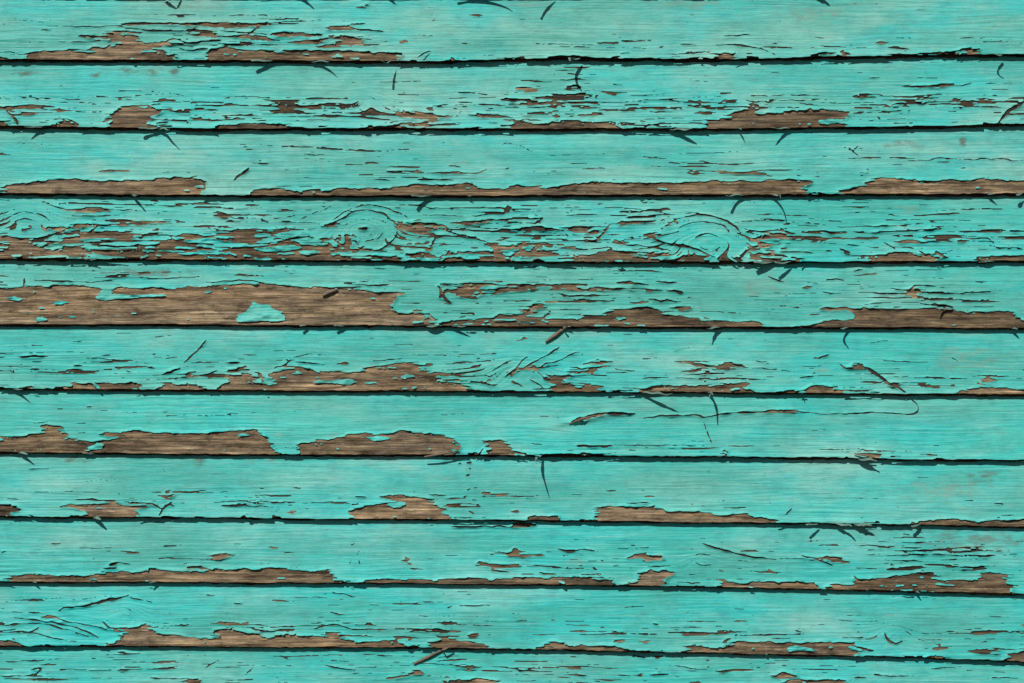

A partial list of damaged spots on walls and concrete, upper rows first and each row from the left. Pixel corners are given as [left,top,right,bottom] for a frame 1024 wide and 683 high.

peeling [0,22,408,61]
peeling [0,169,207,195]
peeling [249,170,813,196]
peeling [835,177,1024,194]
peeling [0,207,713,262]
peeling [0,280,763,343]
peeling [793,286,1024,328]
peeling [156,362,480,391]
peeling [0,425,461,457]
peeling [4,553,342,583]
peeling [716,569,1019,593]
peeling [106,621,490,679]